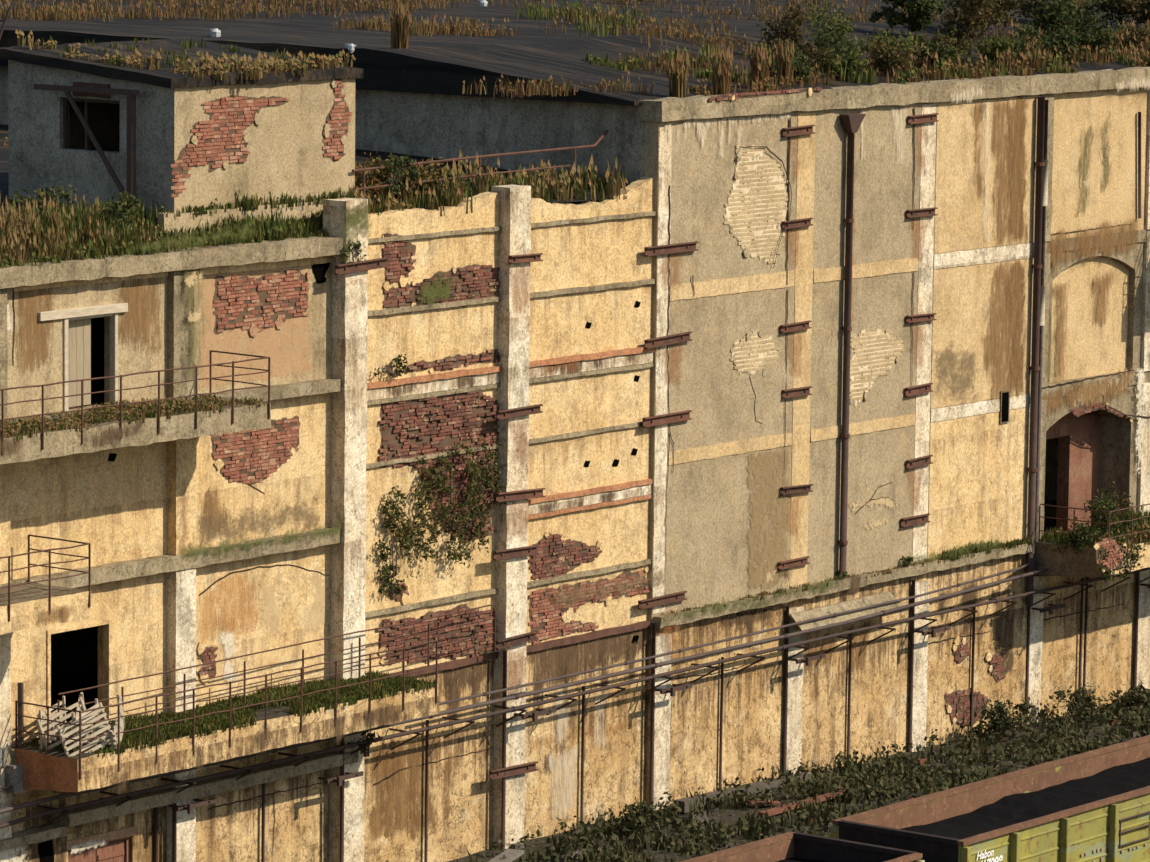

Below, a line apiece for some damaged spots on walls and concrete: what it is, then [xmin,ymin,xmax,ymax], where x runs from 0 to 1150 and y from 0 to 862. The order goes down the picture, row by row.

flaking render [171,95,290,197]
flaking render [724,145,791,265]
damp [953,87,1028,245]
damp [1078,121,1111,213]
flaking render [185,263,330,386]
flaking render [382,233,501,313]
damp [936,262,1027,400]
flaking render [211,416,301,485]
flaking render [378,391,500,541]
crack [199,564,329,595]
flaking render [376,583,497,666]
flaking render [528,532,649,645]